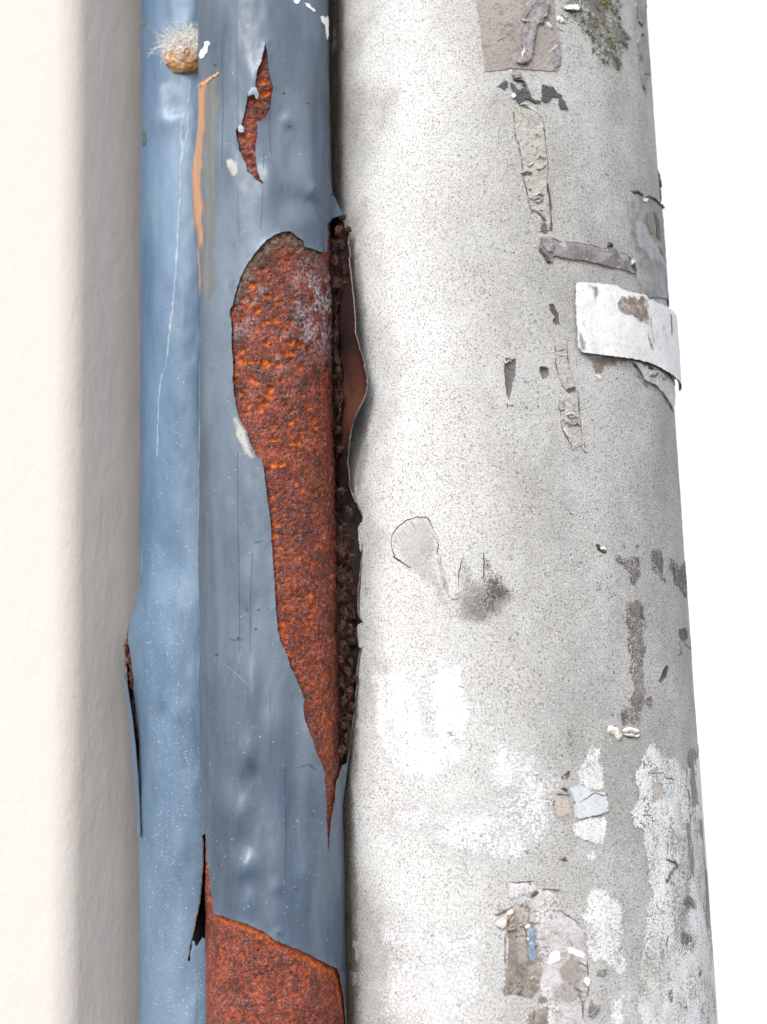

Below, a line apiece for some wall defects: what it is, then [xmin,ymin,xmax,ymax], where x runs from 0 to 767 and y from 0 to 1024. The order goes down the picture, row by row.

peeling [476,0,669,308]
rust [331,214,352,289]
peeling [631,360,676,411]
rust [337,577,358,757]
peeling [495,880,607,1024]